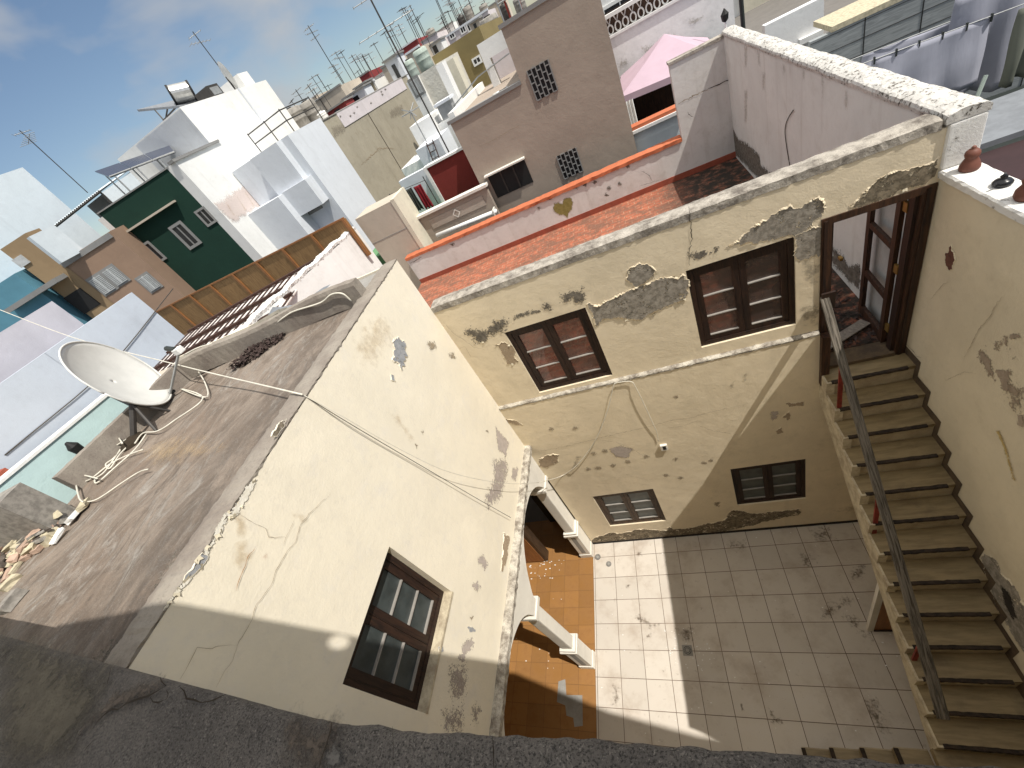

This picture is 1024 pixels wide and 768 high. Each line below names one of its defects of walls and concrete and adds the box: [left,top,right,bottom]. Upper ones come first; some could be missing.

peeling [850,155,941,209]
peeling [688,196,827,261]
peeling [560,262,690,327]
peeling [390,337,408,382]
peeling [464,302,551,365]
peeling [977,333,1024,427]
peeling [484,418,523,511]
peeling [163,479,257,611]
spalling [591,502,801,543]
crack [84,498,327,751]
peeling [1001,587,1018,622]
peeling [441,616,482,733]